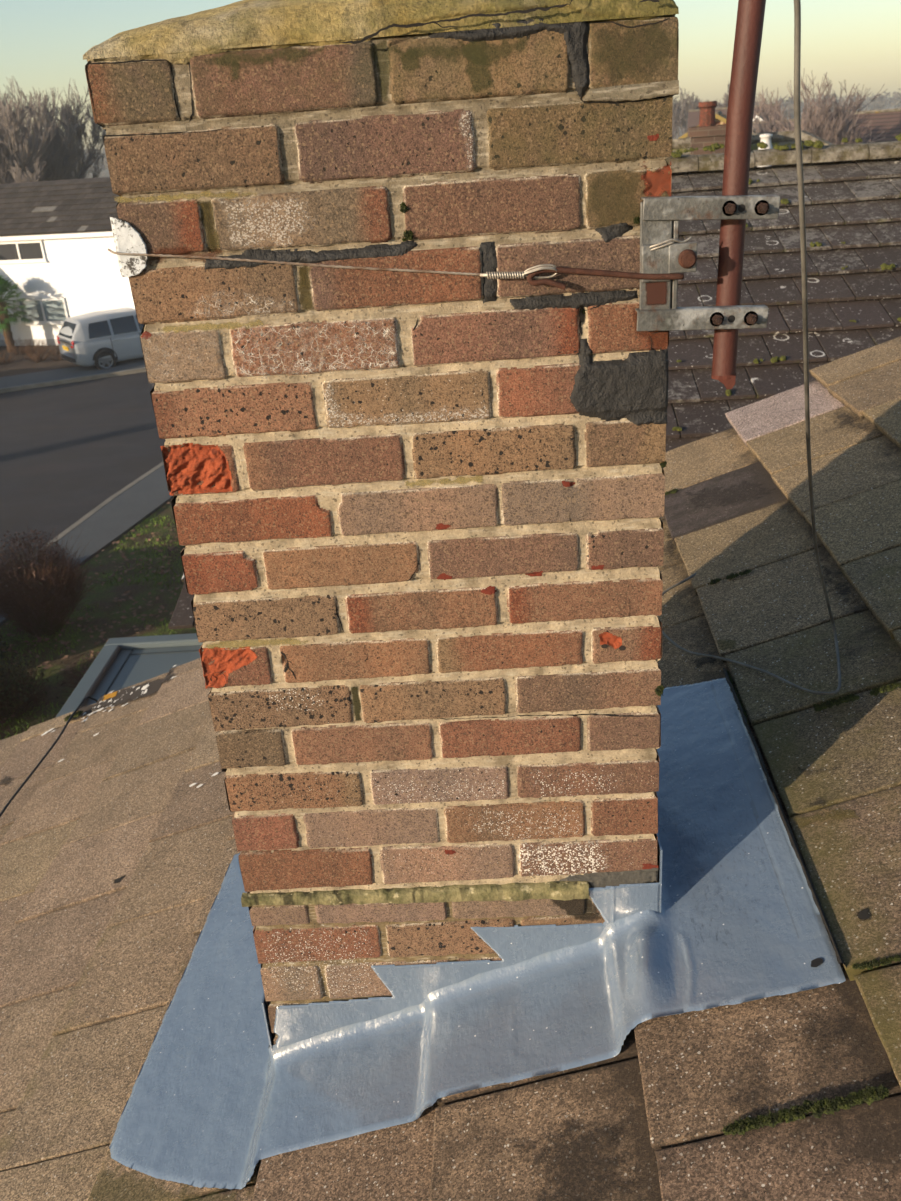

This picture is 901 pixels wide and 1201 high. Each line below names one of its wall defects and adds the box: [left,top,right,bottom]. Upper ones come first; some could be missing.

crack [340,0,669,44]
leakage [460,41,493,92]
spalling [160,443,233,496]
spalling [199,646,257,689]